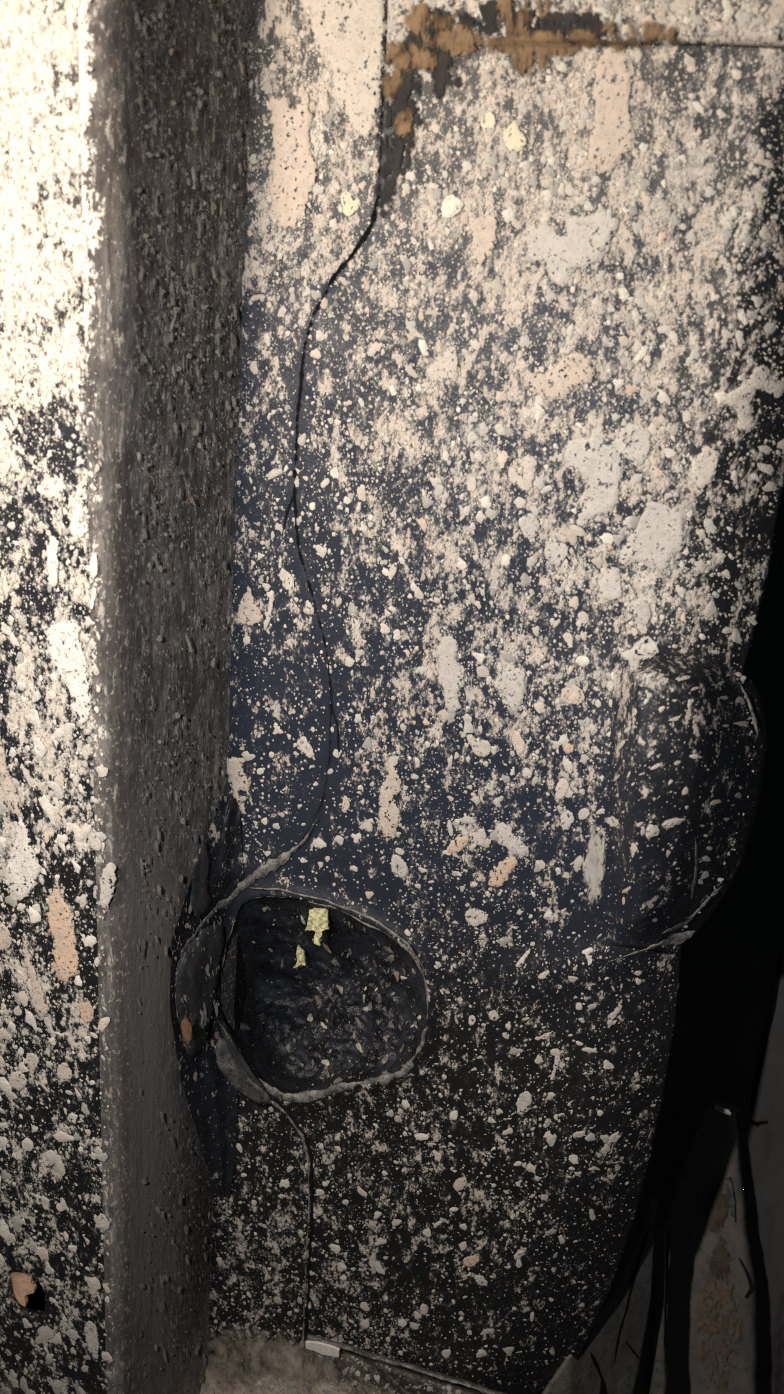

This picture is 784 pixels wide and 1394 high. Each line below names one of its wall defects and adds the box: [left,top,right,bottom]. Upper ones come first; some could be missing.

corrosion [382,0,675,101]
corrosion [395,109,412,136]
crack [281,0,387,846]